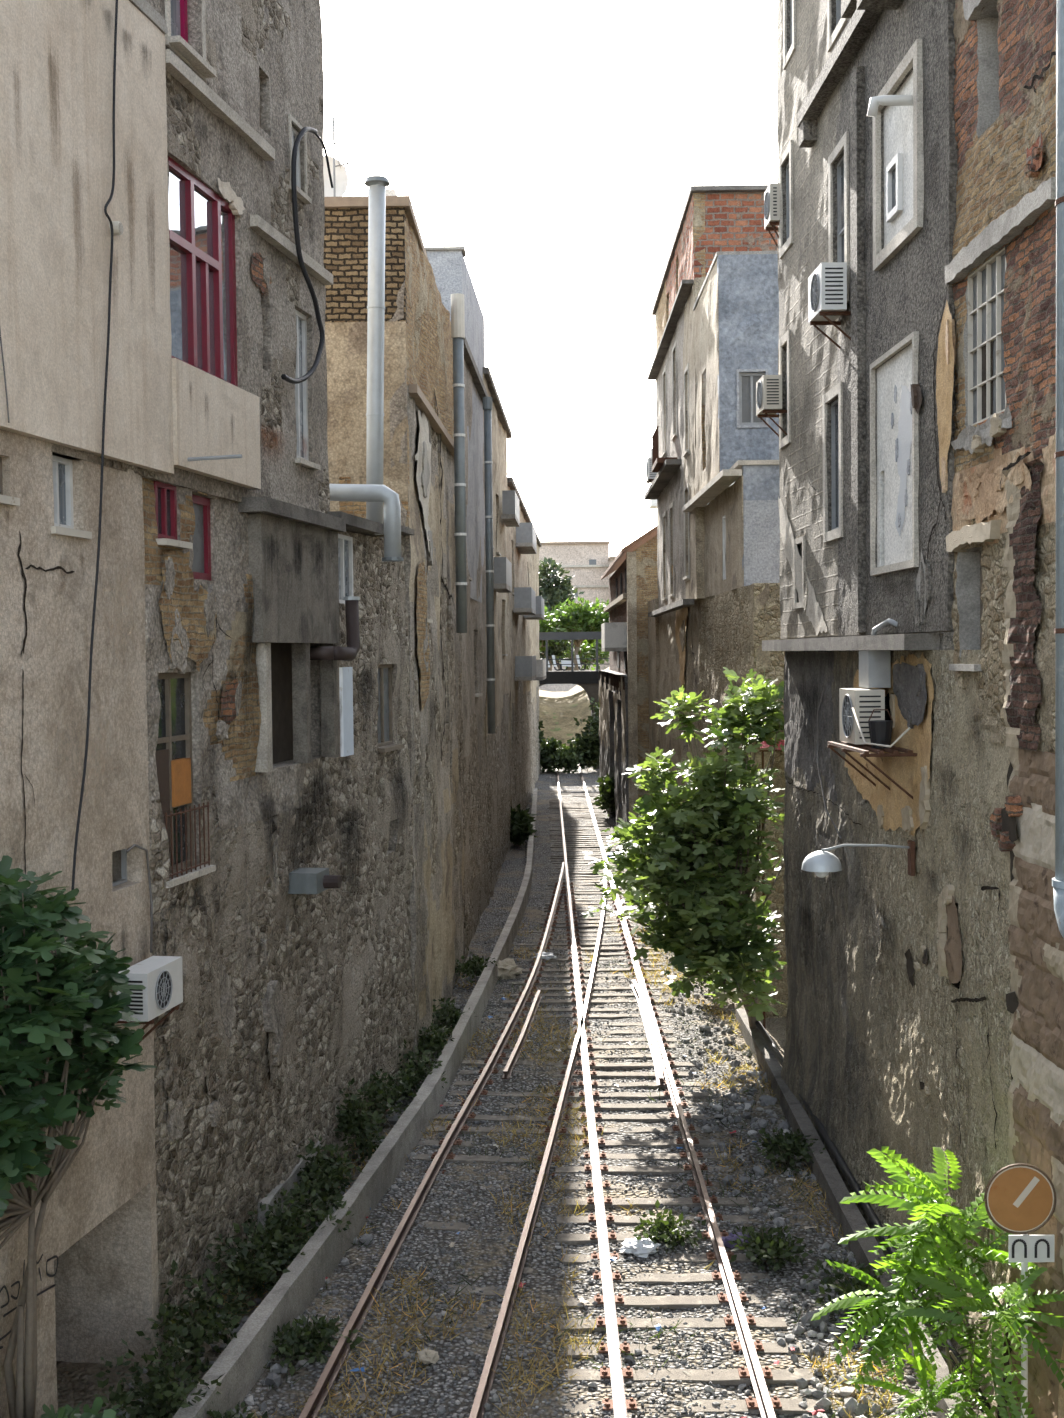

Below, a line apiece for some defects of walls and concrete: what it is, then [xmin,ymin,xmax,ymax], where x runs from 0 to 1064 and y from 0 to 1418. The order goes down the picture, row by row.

spalling [1024,129,1046,178]
flaking render [912,551,931,631]
crack [18,530,75,874]
flaking render [844,652,934,836]
spalling [990,795,1023,852]